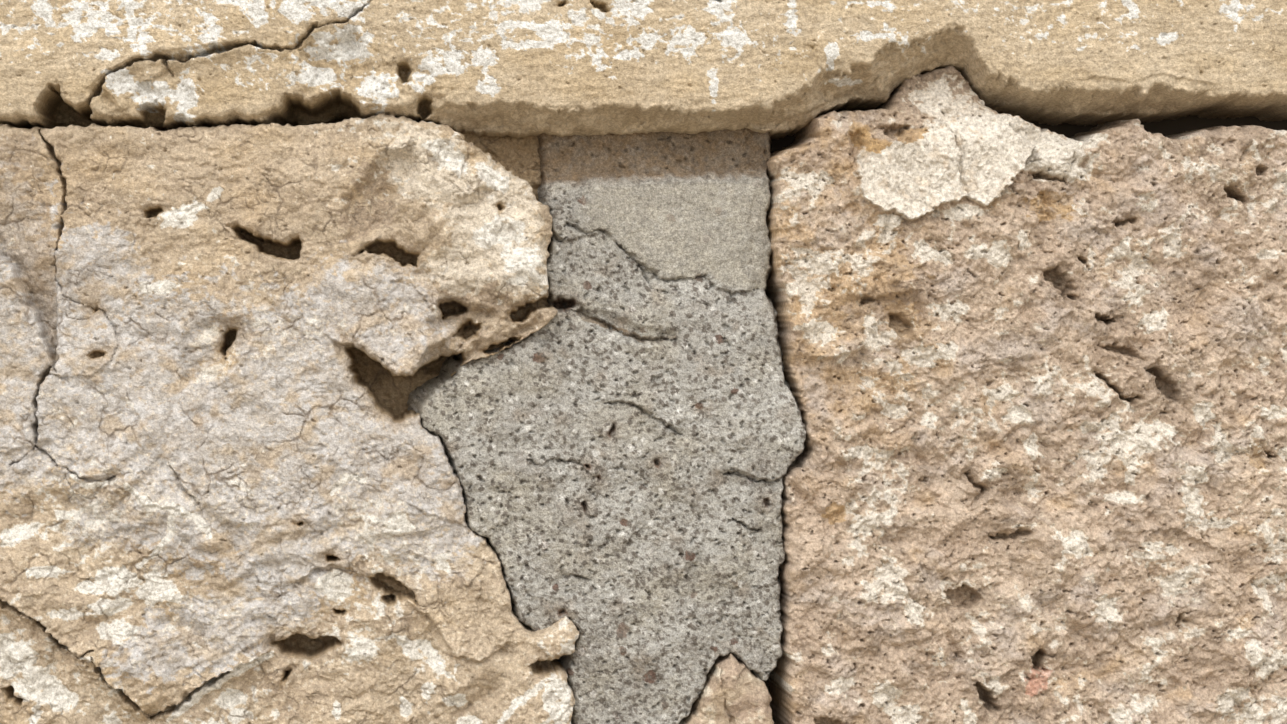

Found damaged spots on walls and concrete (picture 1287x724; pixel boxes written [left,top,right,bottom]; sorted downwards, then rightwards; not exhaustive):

crack [87,0,373,106]
crack [549,210,760,297]
crack [11,129,121,484]
spalling [603,421,620,441]
spalling [577,460,606,518]
spalling [651,456,669,473]
spalling [759,494,775,514]
spalling [553,606,575,621]
crack [0,600,231,721]